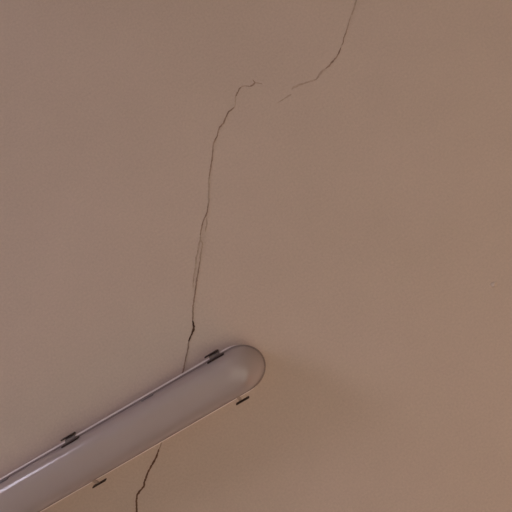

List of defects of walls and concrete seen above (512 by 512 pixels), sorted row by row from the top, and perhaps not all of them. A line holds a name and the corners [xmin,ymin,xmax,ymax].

crack [277,0,357,103]
crack [182,79,262,373]
crack [135,442,162,512]